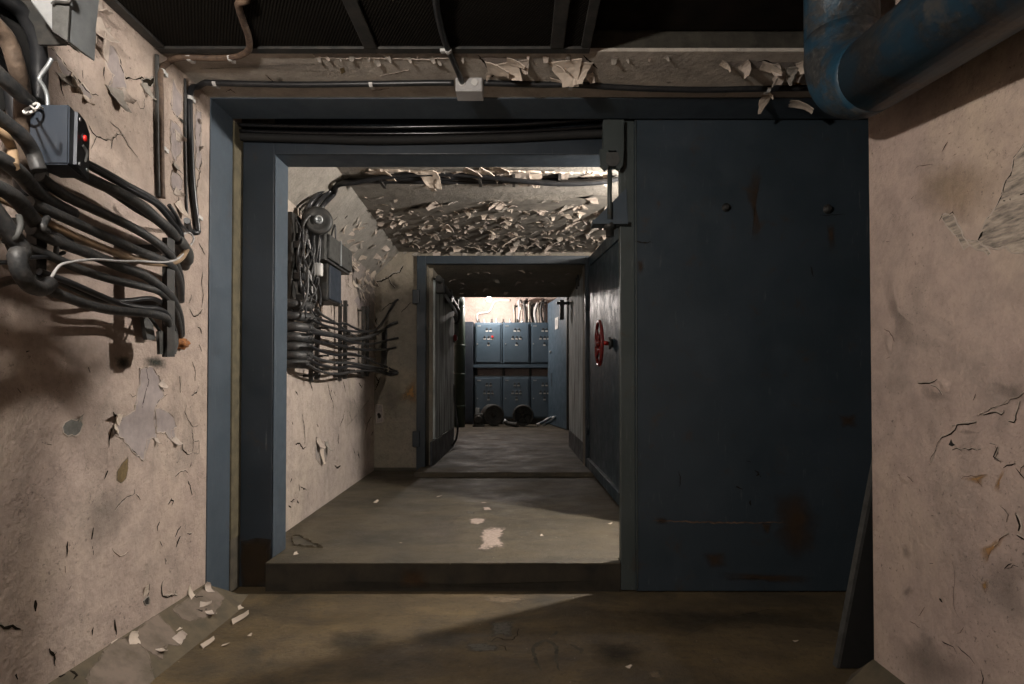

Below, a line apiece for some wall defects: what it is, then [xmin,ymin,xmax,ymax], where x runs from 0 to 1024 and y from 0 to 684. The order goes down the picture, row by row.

peeling [48,0,157,113]
peeling [313,54,530,81]
peeling [543,54,598,88]
peeling [719,59,814,114]
peeling [170,78,204,219]
peeling [939,143,1024,257]
peeling [341,167,618,334]
peeling [109,365,183,461]
spalling [315,437,333,465]
crack [918,379,943,395]
crack [930,392,1024,485]
crack [994,506,1024,569]